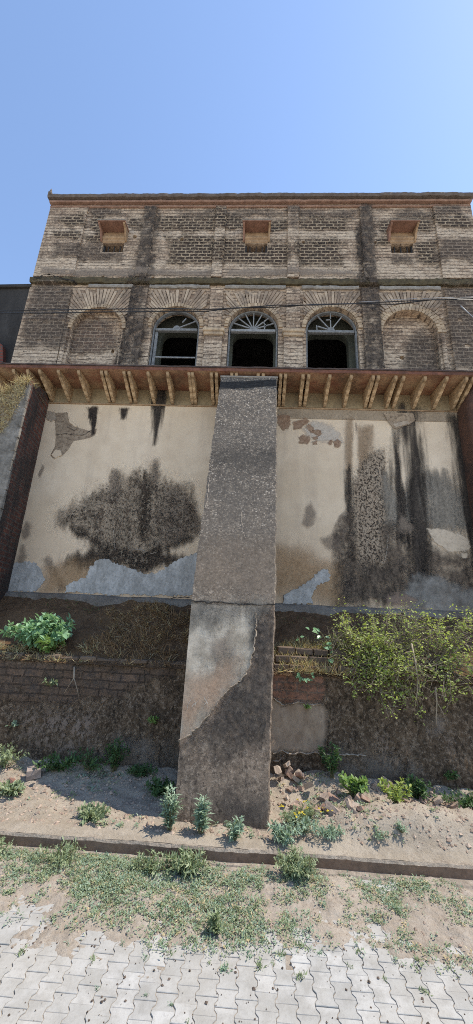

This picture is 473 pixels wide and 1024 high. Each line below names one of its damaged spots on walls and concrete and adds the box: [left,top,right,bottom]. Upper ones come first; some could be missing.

spalling [46,411,97,459]
damp [88,407,97,435]
damp [152,390,166,445]
peeling [277,415,343,448]
damp [45,466,197,591]
damp [276,403,473,607]
peeling [178,599,264,741]